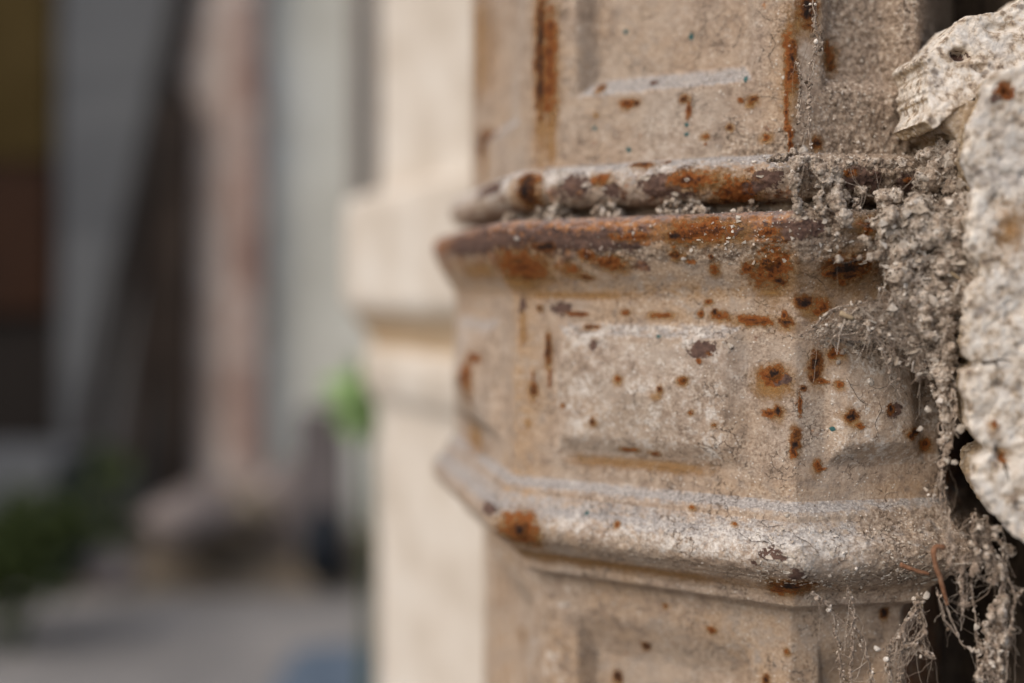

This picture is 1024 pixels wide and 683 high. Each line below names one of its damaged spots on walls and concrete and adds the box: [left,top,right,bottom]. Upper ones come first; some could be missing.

corrosion [532,0,559,161]
corrosion [781,0,819,152]
corrosion [842,165,916,194]
corrosion [447,160,764,351]
peeling [649,208,877,265]
corrosion [739,217,828,295]
corrosion [821,251,879,286]
corrosion [686,340,718,364]
corrosion [757,348,844,459]
corrosion [844,409,866,430]
corrosion [482,500,542,548]
corrosion [768,567,817,596]